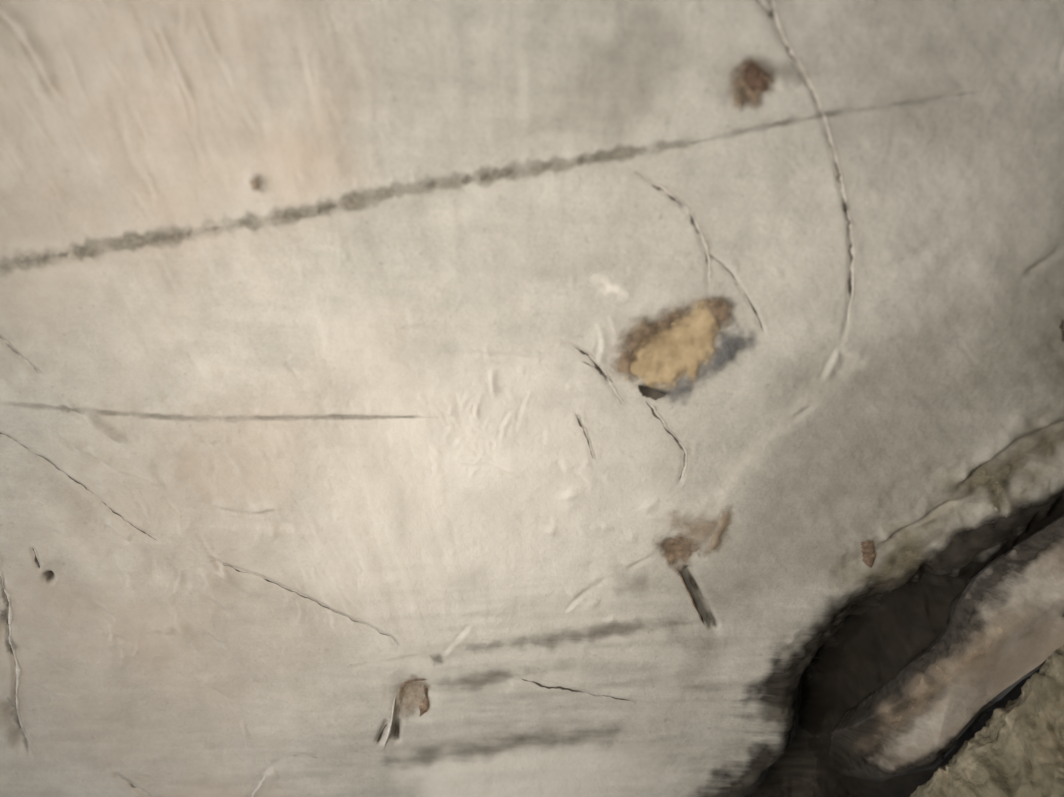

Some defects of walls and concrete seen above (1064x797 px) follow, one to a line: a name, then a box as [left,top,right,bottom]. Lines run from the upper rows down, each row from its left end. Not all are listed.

crack [632,168,763,331]
crack [756,0,856,334]
crack [0,559,33,757]
spalling [861,541,876,568]
damp [701,438,1064,797]